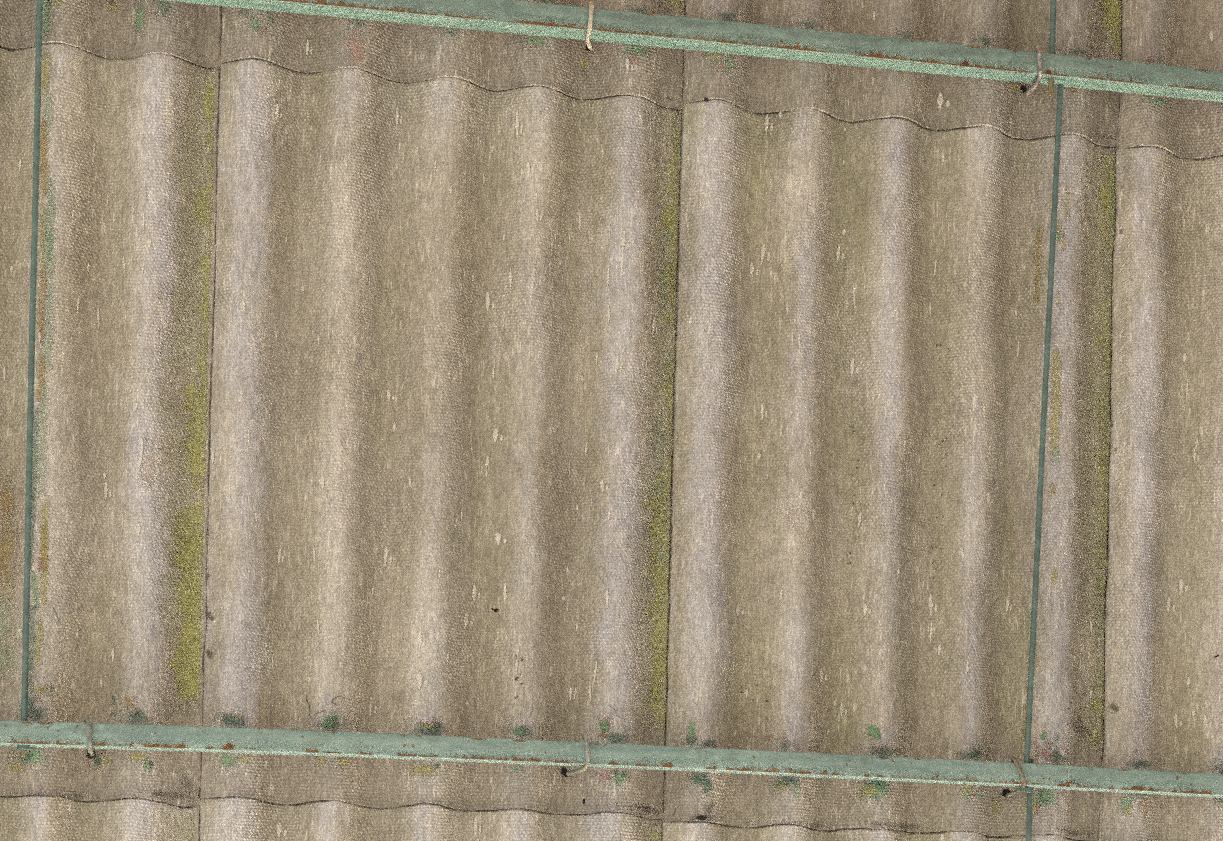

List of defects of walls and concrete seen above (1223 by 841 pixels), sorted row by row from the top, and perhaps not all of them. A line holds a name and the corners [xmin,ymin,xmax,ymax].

corrosion [280,0,839,54]
corrosion [857,46,1222,92]
water stain [1174,710,1212,730]
corrosion [0,721,686,768]
corrosion [706,756,1217,795]